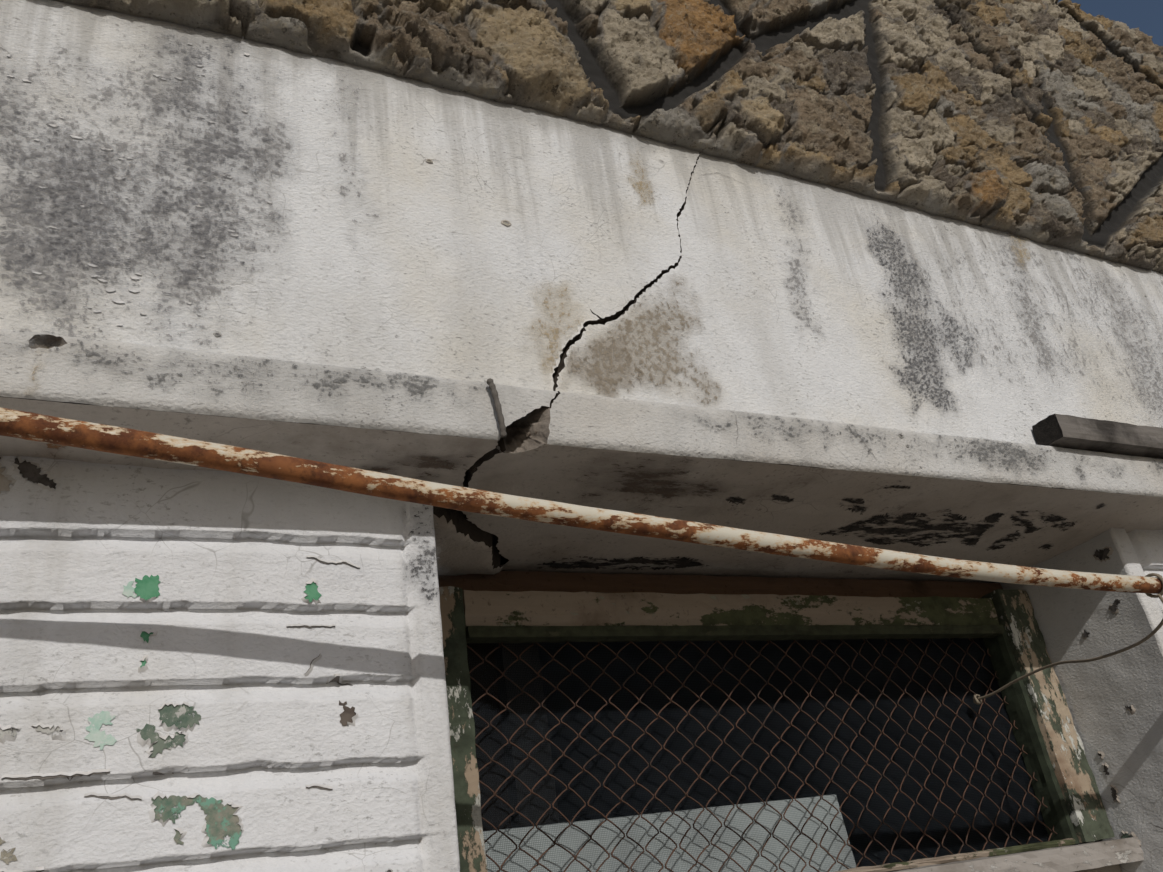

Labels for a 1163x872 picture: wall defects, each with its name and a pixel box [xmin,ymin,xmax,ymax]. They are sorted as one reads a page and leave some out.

water stain [0,29,486,410]
crack [547,154,744,408]
water stain [867,200,1163,427]
water stain [531,278,1123,483]
spalling [497,406,551,453]
crack [433,437,506,569]
peeling [820,498,1077,551]
peeling [122,575,160,606]
peeling [301,577,322,608]
peeling [136,701,201,757]
peeling [339,700,359,726]
peeling [148,791,244,850]